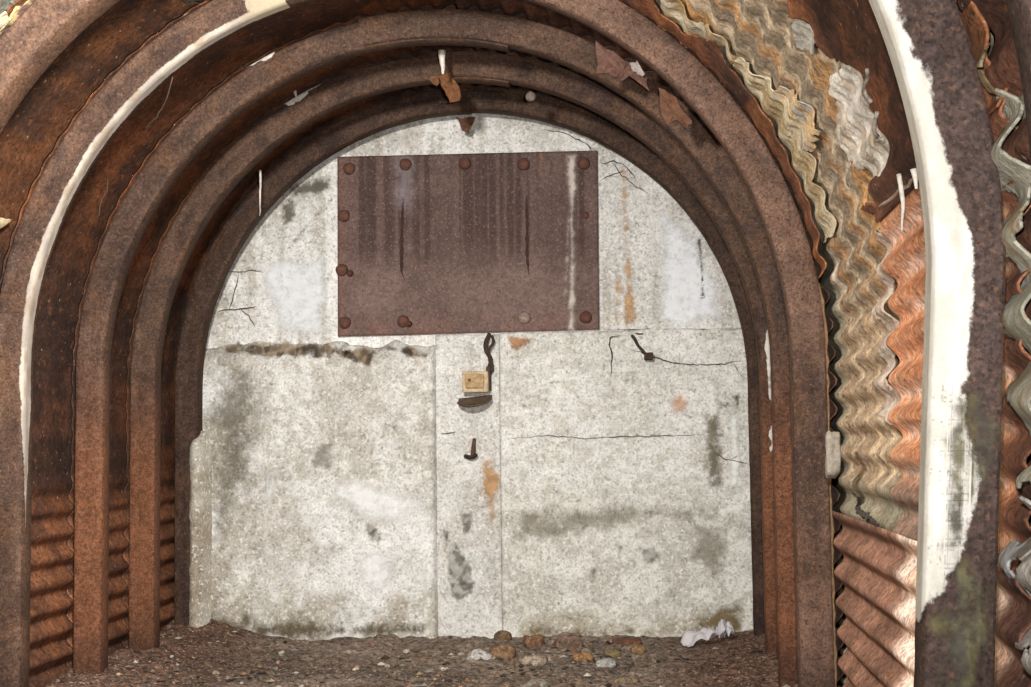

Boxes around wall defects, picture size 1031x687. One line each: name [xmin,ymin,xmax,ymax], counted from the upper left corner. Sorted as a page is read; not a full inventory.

peeling [869,0,982,622]
leakage [219,390,248,509]
leakage [315,447,330,467]
leakage [335,482,418,521]
rust [483,461,499,517]
leakage [359,552,390,589]